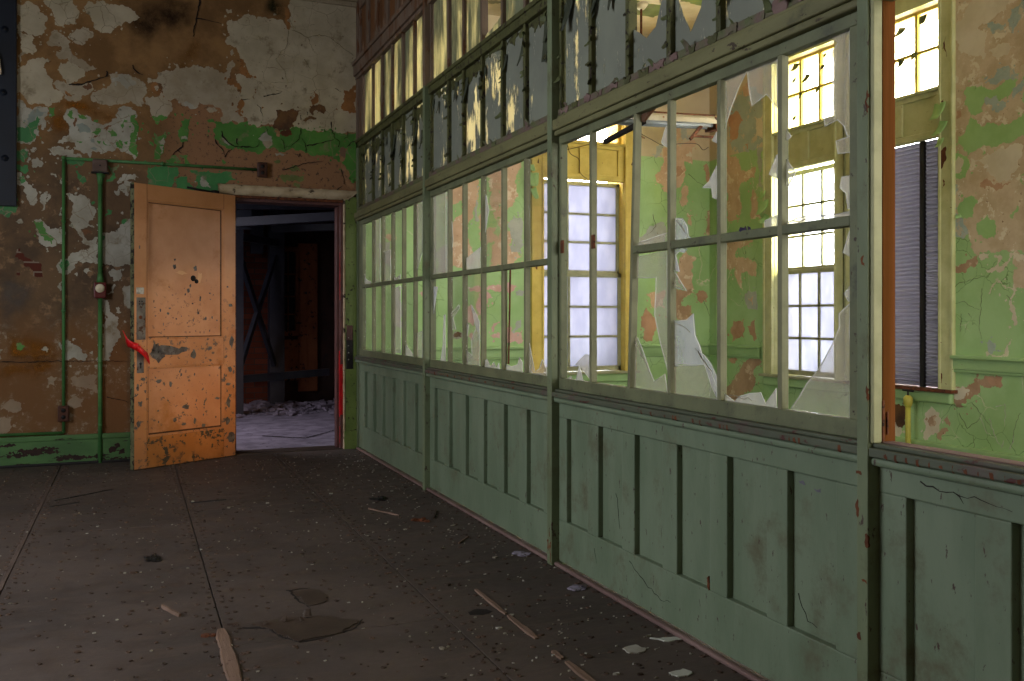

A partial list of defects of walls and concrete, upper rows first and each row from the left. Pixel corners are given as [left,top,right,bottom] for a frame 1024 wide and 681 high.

crack [193,0,221,36]
crack [69,71,108,86]
crack [215,30,354,190]
peeling [929,0,1024,357]
peeling [0,0,573,412]
peeling [0,399,24,433]
flaking render [895,403,905,437]
peeling [919,374,1003,441]
crack [920,481,1012,512]